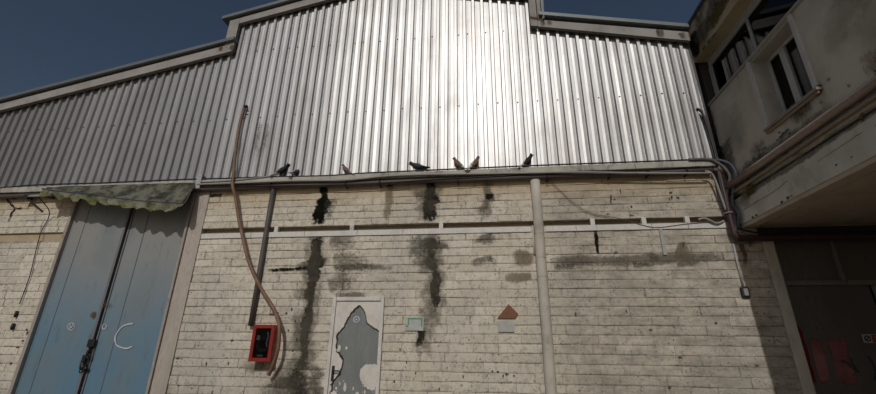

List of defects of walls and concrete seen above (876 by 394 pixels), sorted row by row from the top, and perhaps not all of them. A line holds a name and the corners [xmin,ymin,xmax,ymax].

damp [312,187,333,224]
damp [416,183,440,221]
damp [267,236,381,394]
peeling [328,301,381,394]
damp [410,235,445,347]